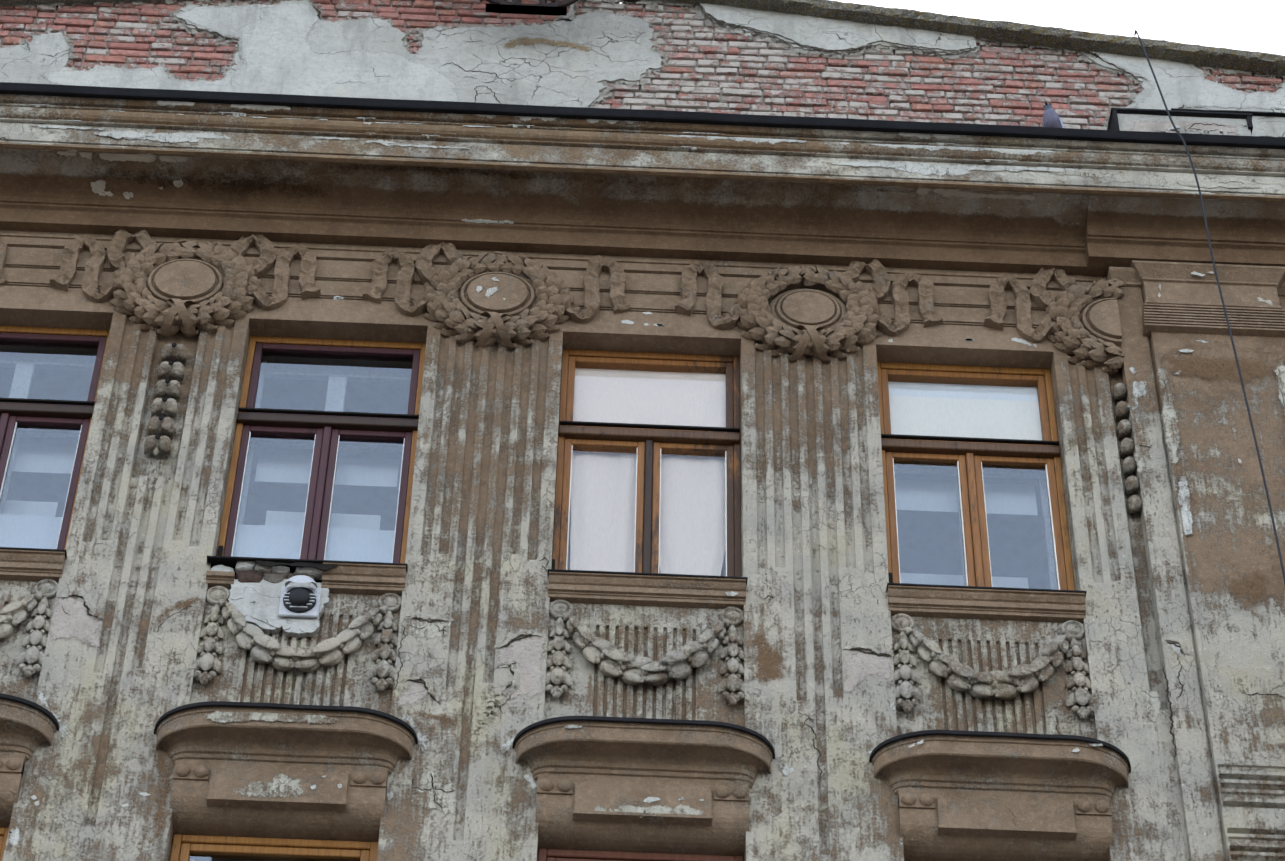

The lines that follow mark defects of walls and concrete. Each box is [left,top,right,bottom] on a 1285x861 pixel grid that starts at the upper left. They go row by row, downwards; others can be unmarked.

crack [438,37,505,104]
flaking render [0,0,1285,200]
peeling [1274,365,1285,433]
peeling [1127,367,1193,536]
crack [394,620,412,690]
peeling [1165,637,1189,656]
peeling [1145,690,1161,722]